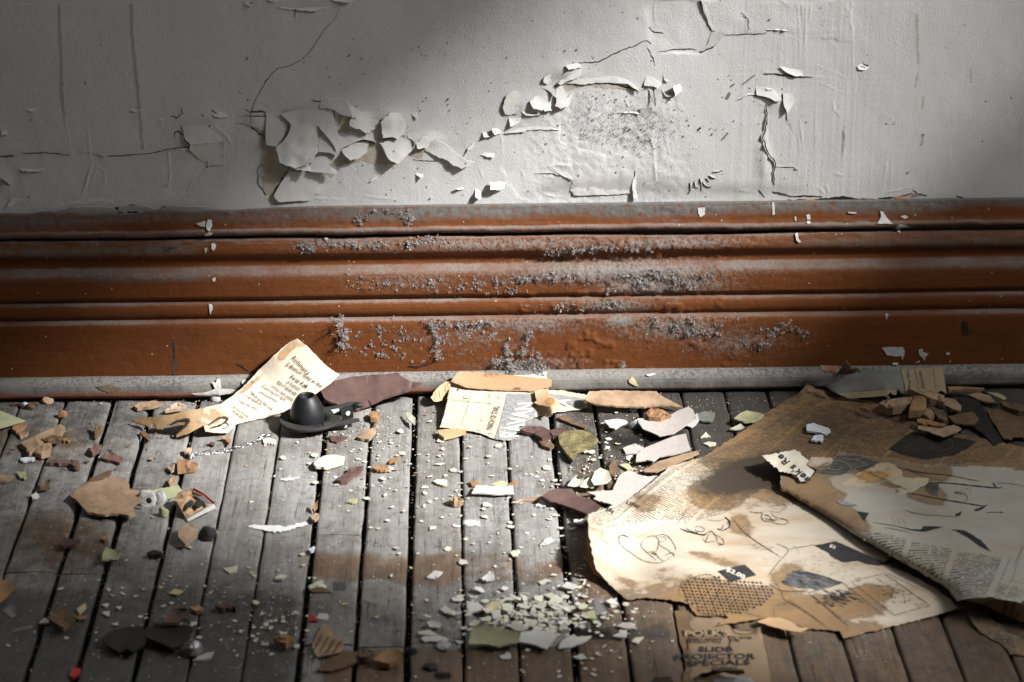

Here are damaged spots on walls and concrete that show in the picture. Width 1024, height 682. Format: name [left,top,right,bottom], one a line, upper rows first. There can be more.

crack [238,11,339,132]
crack [579,28,705,64]
peeling [691,0,787,53]
peeling [741,67,811,113]
crack [0,109,190,157]
peeling [250,63,682,202]
crack [758,93,798,197]